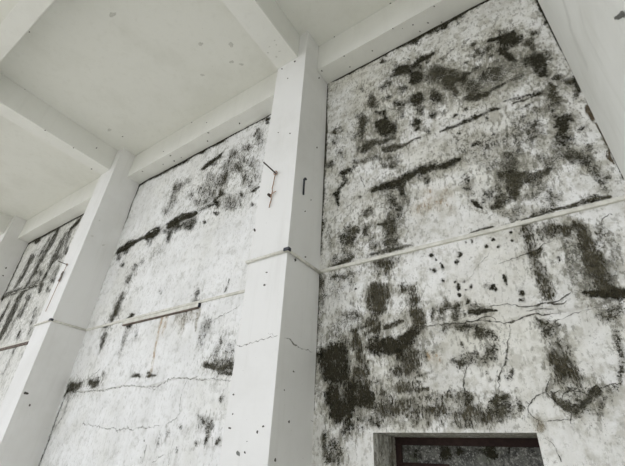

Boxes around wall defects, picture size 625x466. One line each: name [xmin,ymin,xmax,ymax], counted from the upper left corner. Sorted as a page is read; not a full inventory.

leakage [0,214,83,362]
leakage [99,292,125,351]
leakage [116,114,271,284]
leakage [203,330,234,376]
leakage [314,0,625,465]
crack [414,293,613,420]
crack [527,380,619,461]